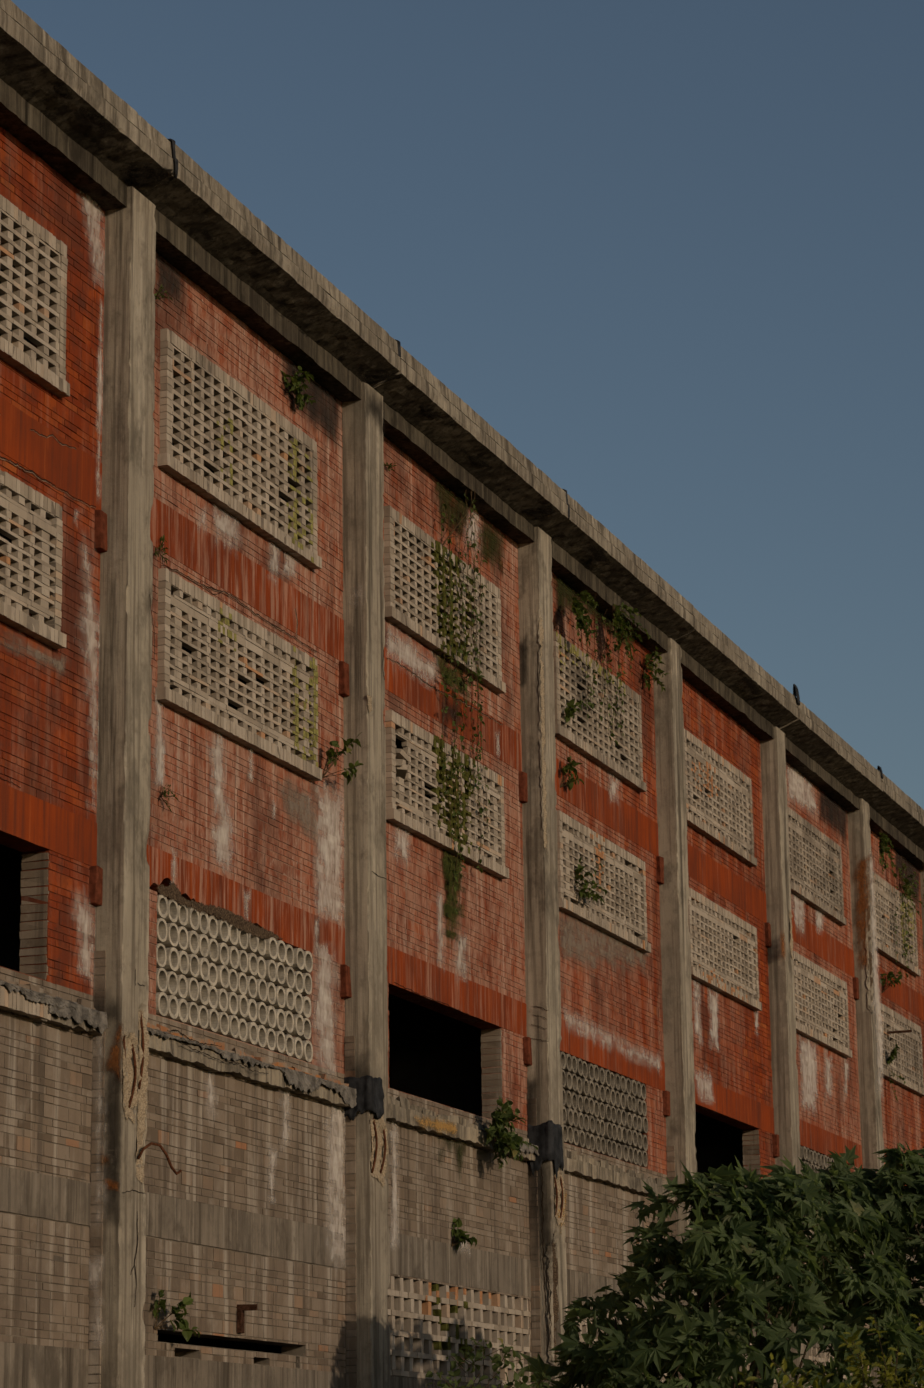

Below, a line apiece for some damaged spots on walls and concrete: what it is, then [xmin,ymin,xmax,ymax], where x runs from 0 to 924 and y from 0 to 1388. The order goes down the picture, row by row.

crack [0,456,96,509]
water stain [213,739,230,860]